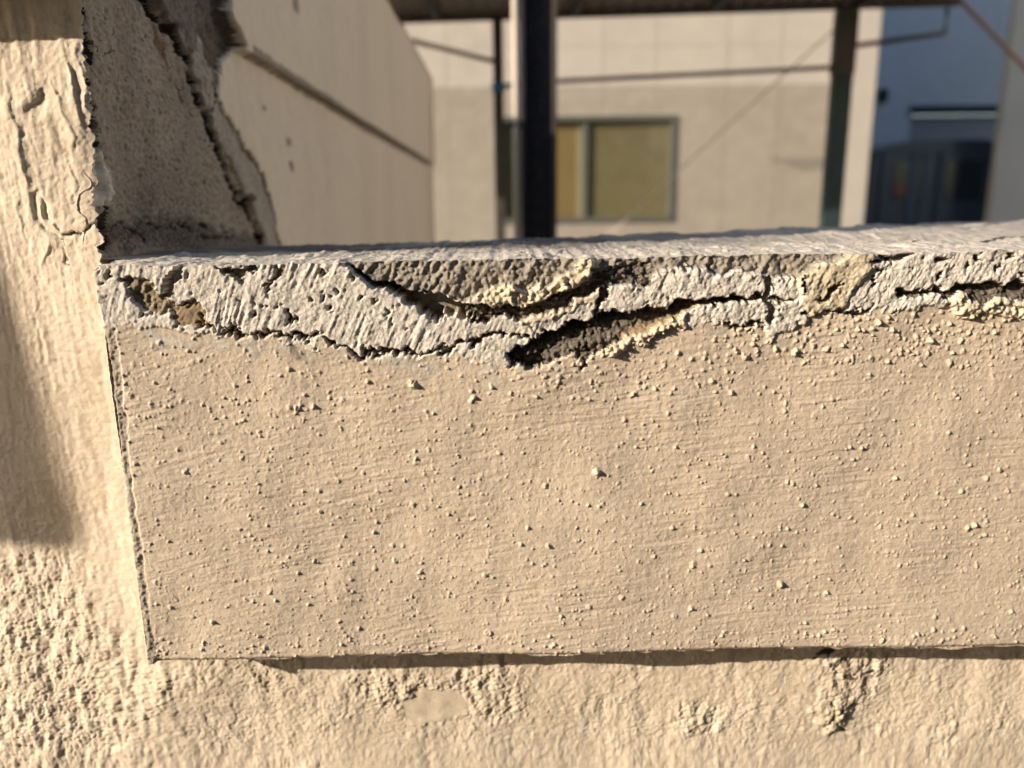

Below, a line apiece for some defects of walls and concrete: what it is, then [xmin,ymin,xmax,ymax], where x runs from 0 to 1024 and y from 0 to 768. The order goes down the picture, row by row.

crack [54,0,262,266]
spalling [77,0,1024,370]
crack [197,312,546,370]